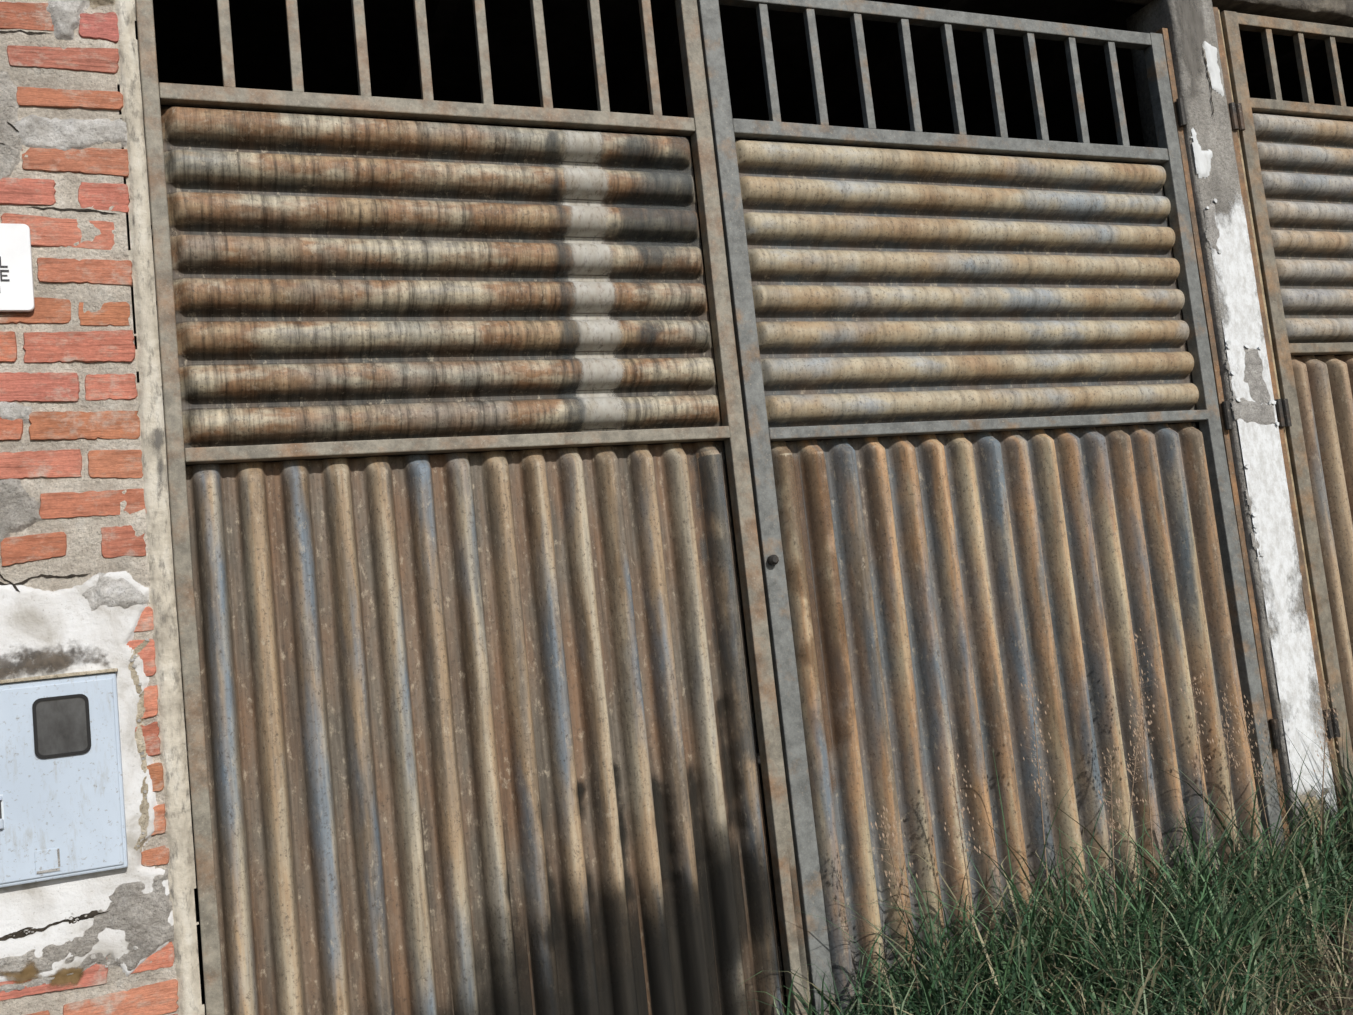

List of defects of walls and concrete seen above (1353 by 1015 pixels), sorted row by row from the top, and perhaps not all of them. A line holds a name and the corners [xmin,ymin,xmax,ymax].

peeling [1225,340,1279,426]
peeling [1245,489,1264,561]
crack [0,573,90,592]
spalling [128,638,150,852]
crack [0,910,110,941]
spalling [68,910,98,924]
spalling [0,934,152,992]